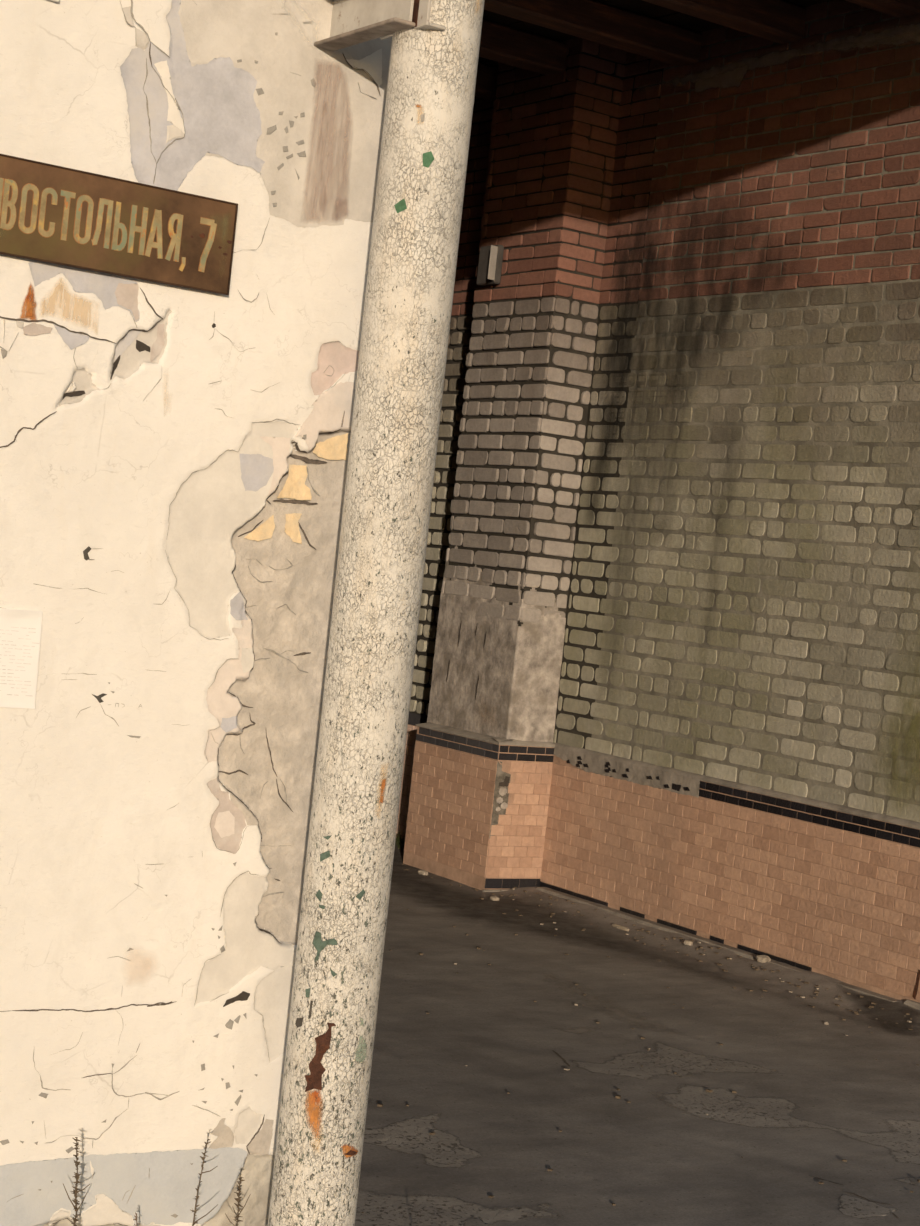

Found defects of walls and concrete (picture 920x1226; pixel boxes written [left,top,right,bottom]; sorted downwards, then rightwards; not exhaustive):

peeling [120,0,392,228]
peeling [423,151,434,168]
crack [0,288,163,369]
peeling [28,260,140,322]
crack [0,411,57,448]
spalling [165,341,359,1062]
peeling [554,747,700,798]
crack [0,986,179,1148]
corrosion [305,1023,336,1136]
spalling [193,1065,275,1226]
corrosion [342,1145,358,1158]
spalling [42,1194,159,1226]